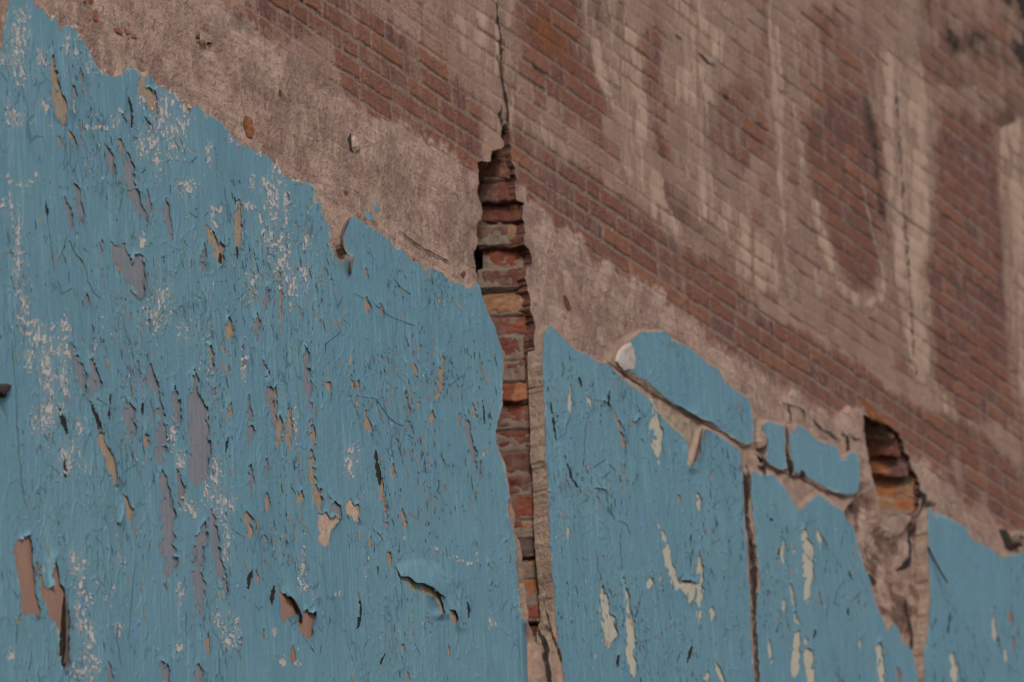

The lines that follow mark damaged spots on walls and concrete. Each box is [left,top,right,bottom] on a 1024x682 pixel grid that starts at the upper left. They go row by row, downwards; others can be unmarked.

crack [496,1,509,125]
peeling [0,35,513,682]
crack [475,149,562,682]
peeling [547,355,744,682]
crack [607,361,861,681]
spalling [863,424,915,515]